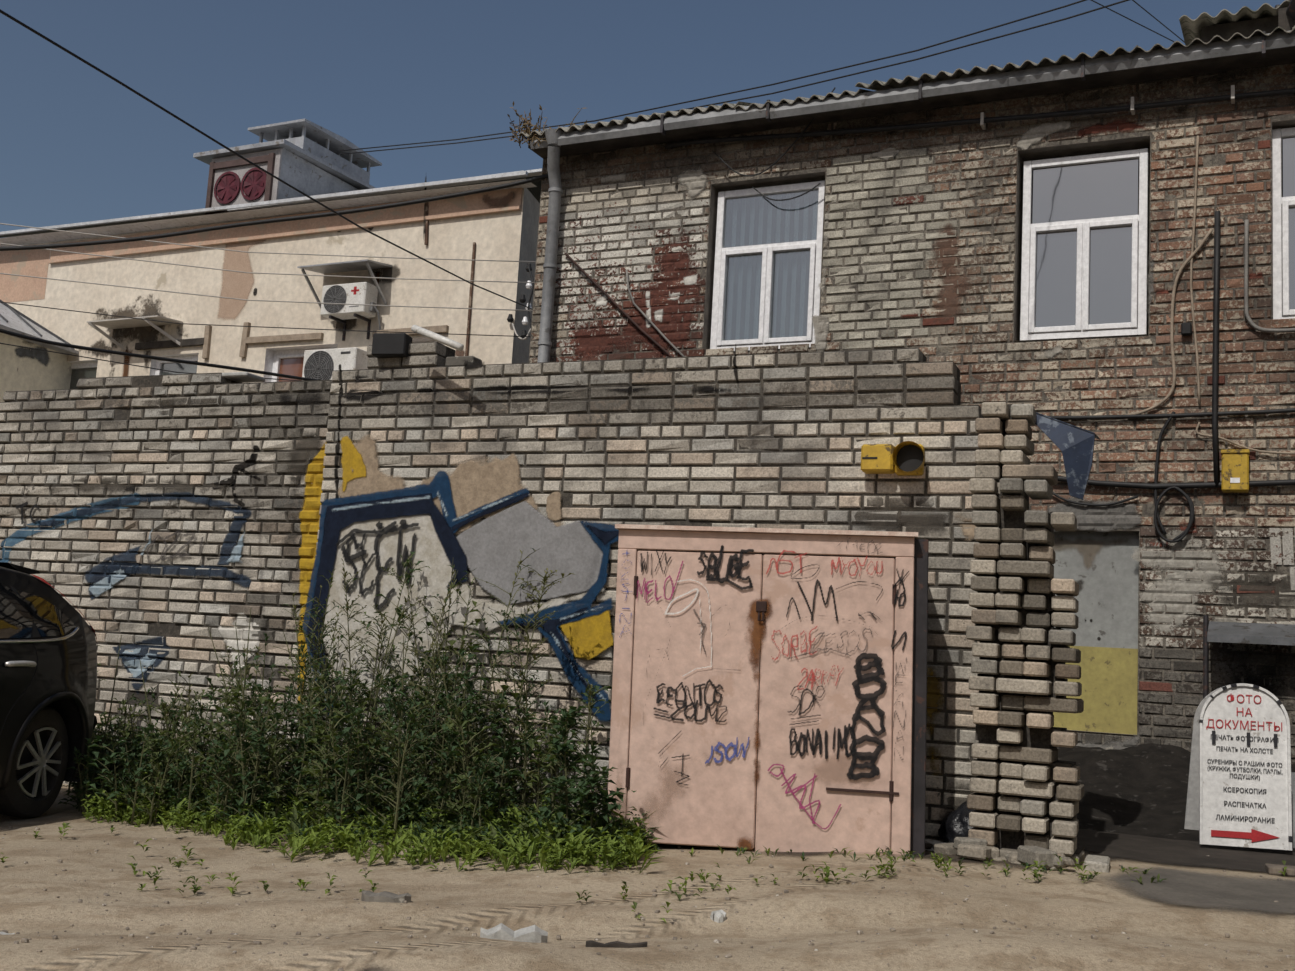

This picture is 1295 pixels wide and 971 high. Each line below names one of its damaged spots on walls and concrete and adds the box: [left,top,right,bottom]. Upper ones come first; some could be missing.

peeling [218,240,264,319]
peeling [573,232,706,360]
peeling [297,435,405,709]
flaking render [321,454,604,701]
corrosion [747,599,772,678]
corrosion [738,838,752,849]